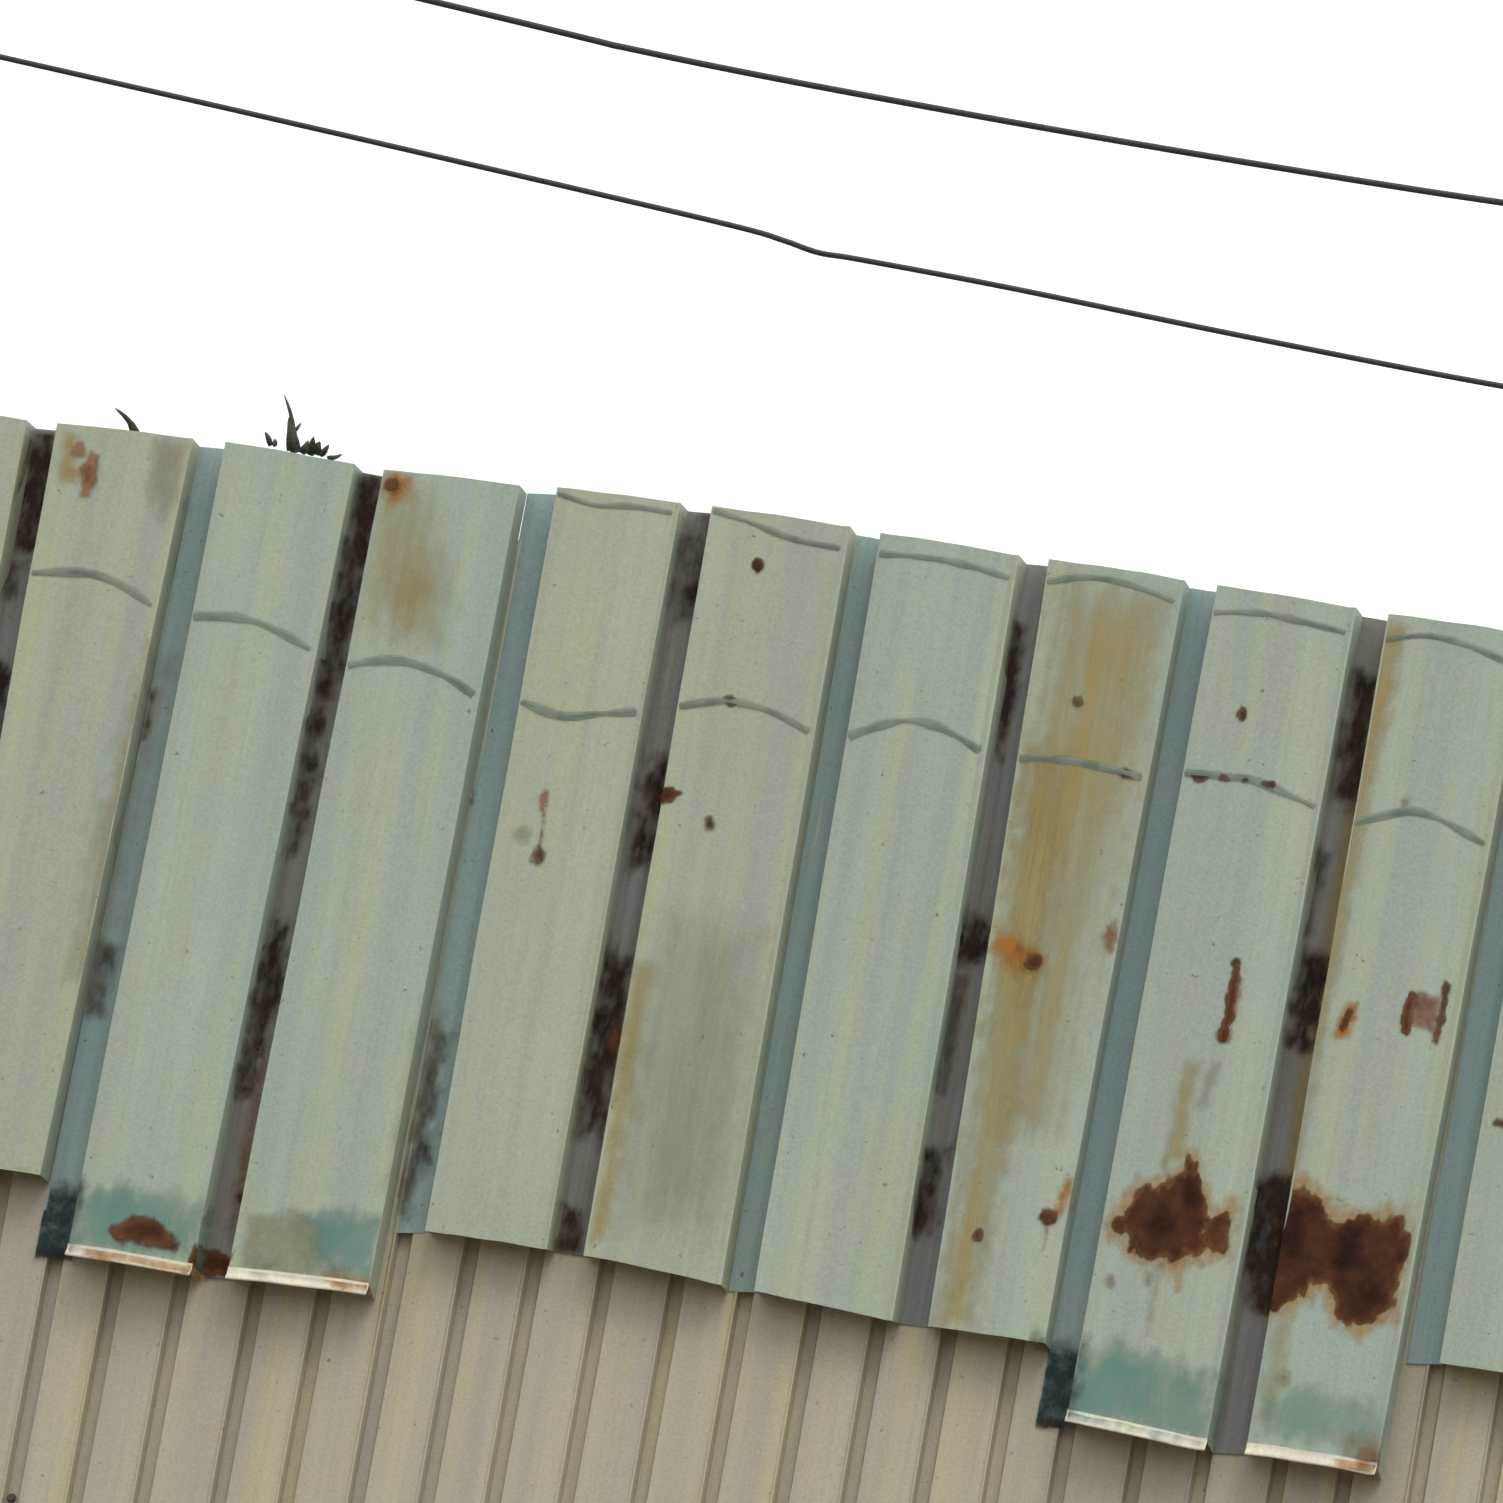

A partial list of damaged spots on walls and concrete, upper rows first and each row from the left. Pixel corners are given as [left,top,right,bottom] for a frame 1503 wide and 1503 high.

rust [8,433,99,592]
rust [292,474,410,853]
rust [999,622,1022,741]
rust [957,918,1042,1004]
rust [1216,958,1241,1042]
rust [1400,981,1451,1044]
damp [79,1188,210,1251]
rust [94,1216,232,1280]
damp [247,1214,379,1278]
rust [1111,1083,1232,1284]
rust [1246,1175,1411,1334]
damp [1070,1345,1201,1434]